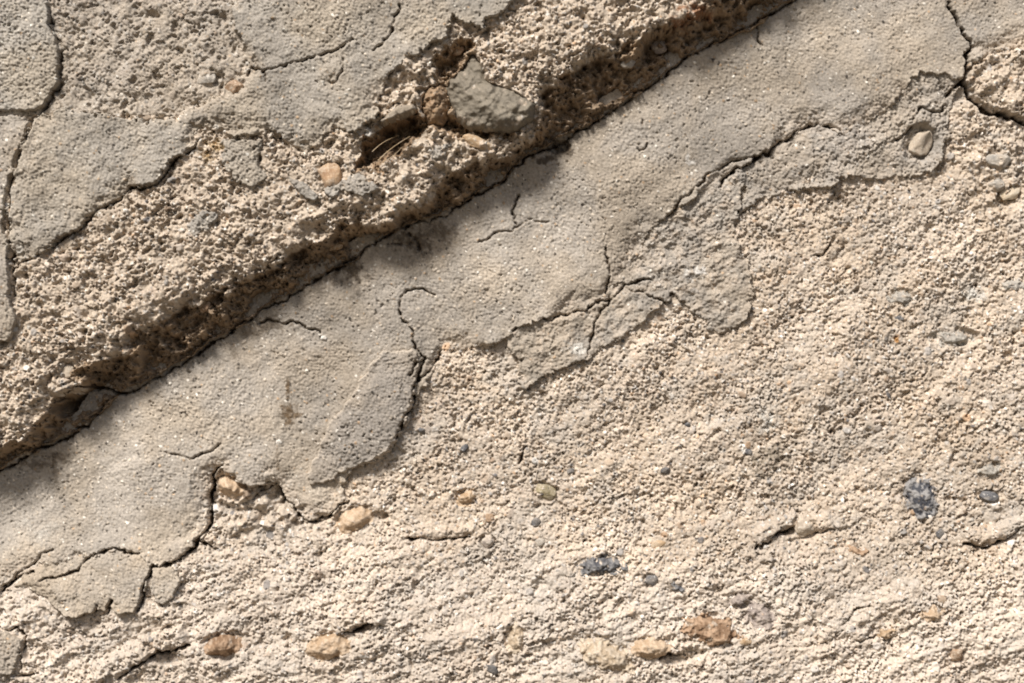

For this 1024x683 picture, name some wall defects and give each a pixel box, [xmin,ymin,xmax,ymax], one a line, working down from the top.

crack [892,0,1024,142]
spalling [0,0,712,446]
crack [0,0,796,471]
flaking render [505,171,756,390]
crack [666,124,843,218]
flaking render [307,349,420,485]
crack [2,444,221,612]